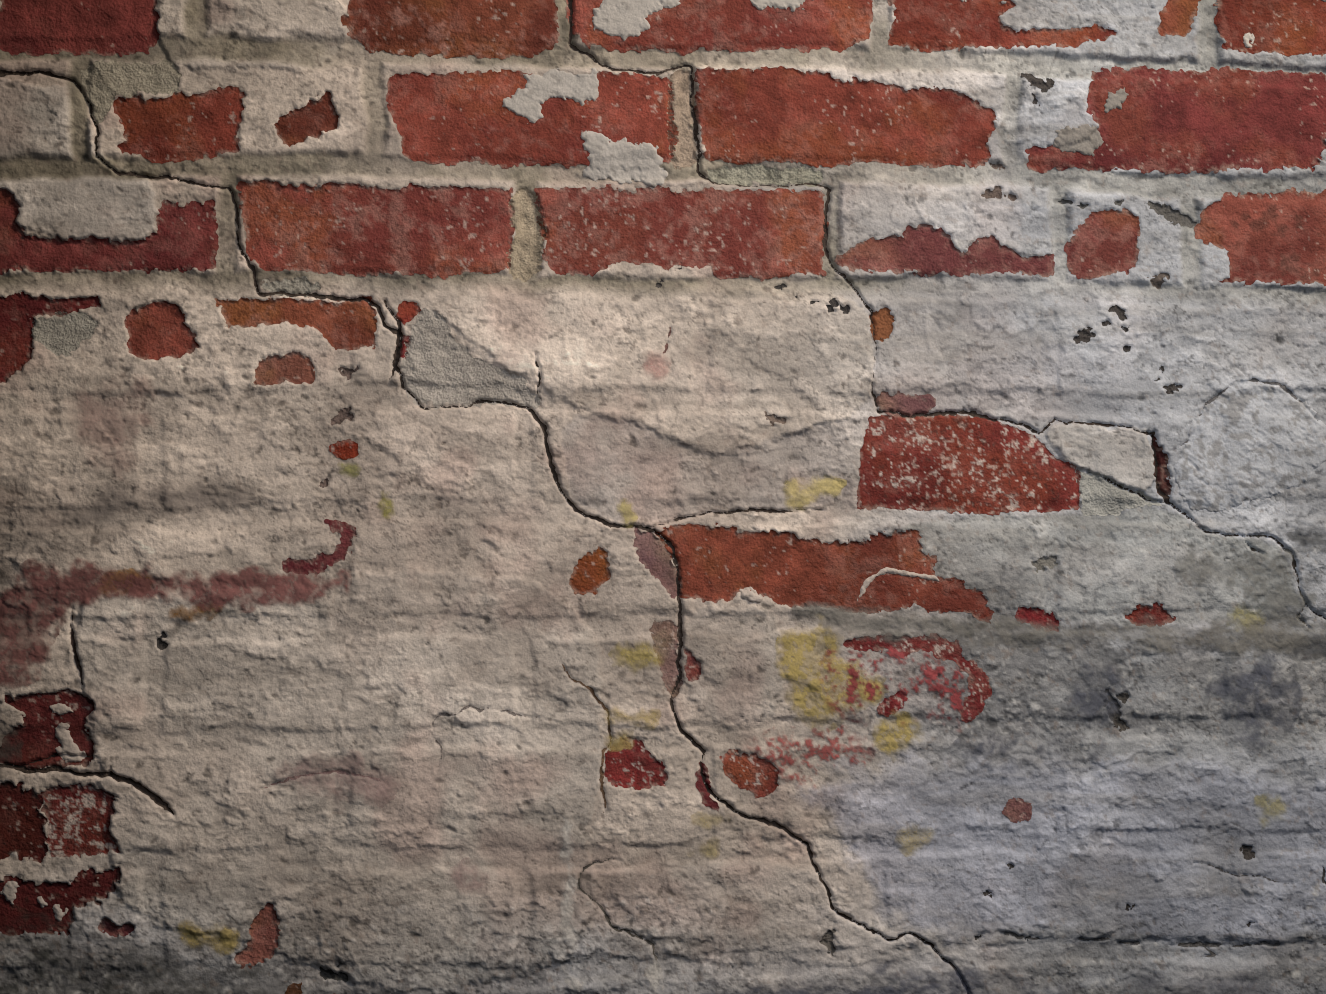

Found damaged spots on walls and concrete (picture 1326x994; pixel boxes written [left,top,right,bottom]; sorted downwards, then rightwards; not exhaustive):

peeling [0,0,246,164]
peeling [0,188,219,275]
peeling [215,0,1326,380]
peeling [0,291,101,383]
peeling [124,301,200,360]
crack [568,0,1326,629]
peeling [857,391,1081,516]
crack [0,70,969,994]
peeling [633,523,995,624]
peeling [0,689,134,937]
leakage [179,925,237,953]
leakage [731,970,981,994]